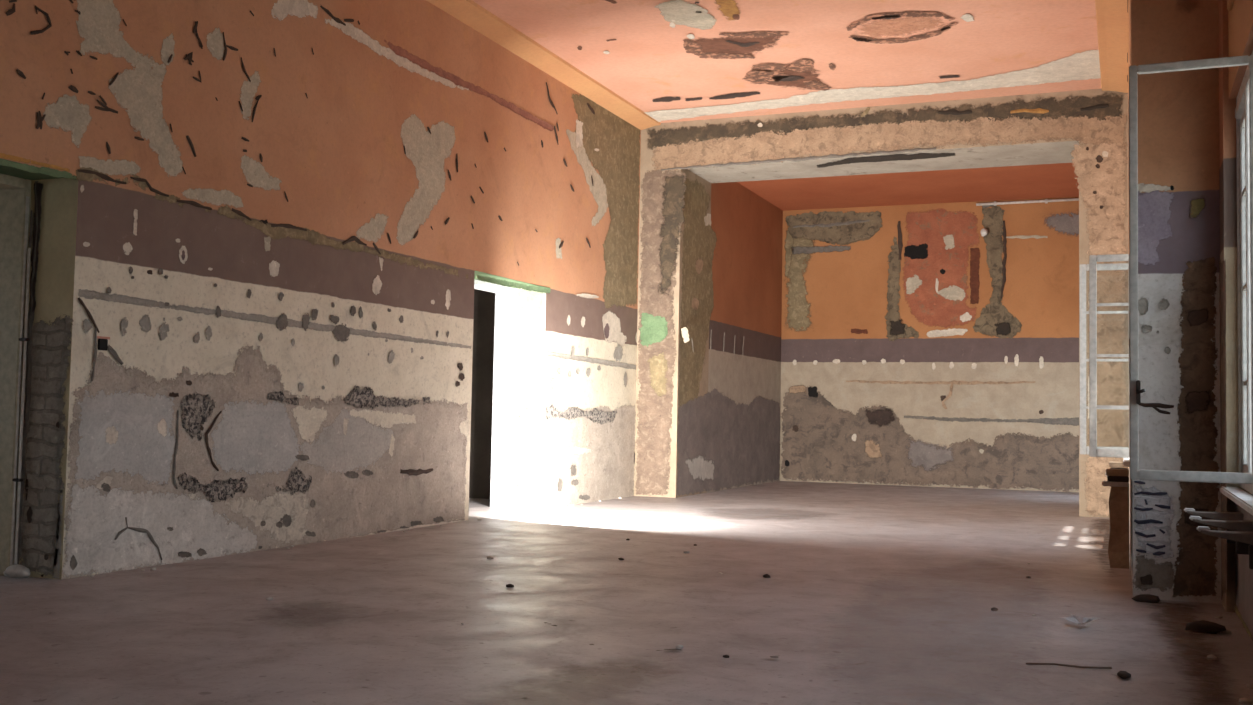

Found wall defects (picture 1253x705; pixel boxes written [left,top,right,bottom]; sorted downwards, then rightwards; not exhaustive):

peeling [655,0,717,39]
peeling [0,0,262,177]
peeling [182,137,288,210]
peeling [356,114,458,245]
peeling [259,220,271,251]
spalling [538,82,1227,600]
crack [173,410,222,489]
spalling [20,315,469,580]
crack [115,517,162,560]